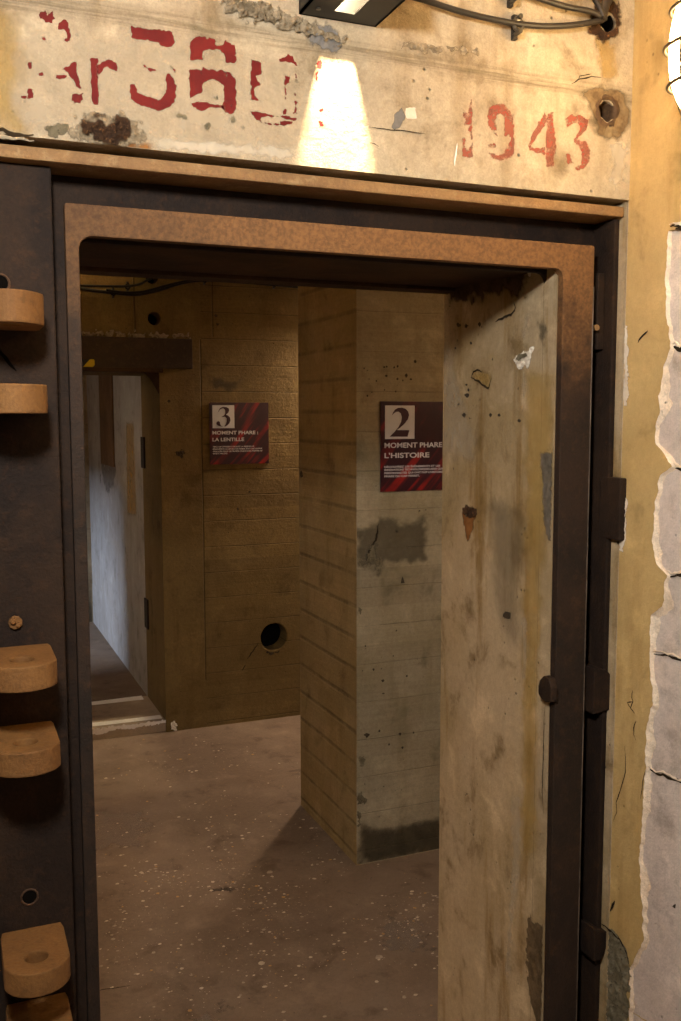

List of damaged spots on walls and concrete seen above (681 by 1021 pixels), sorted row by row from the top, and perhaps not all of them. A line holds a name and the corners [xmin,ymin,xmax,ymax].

spalling [220,0,347,47]
spalling [68,110,150,149]
spalling [595,94,620,129]
peeling [602,0,681,1021]
leakage [357,520,426,575]
leakage [361,821,439,862]